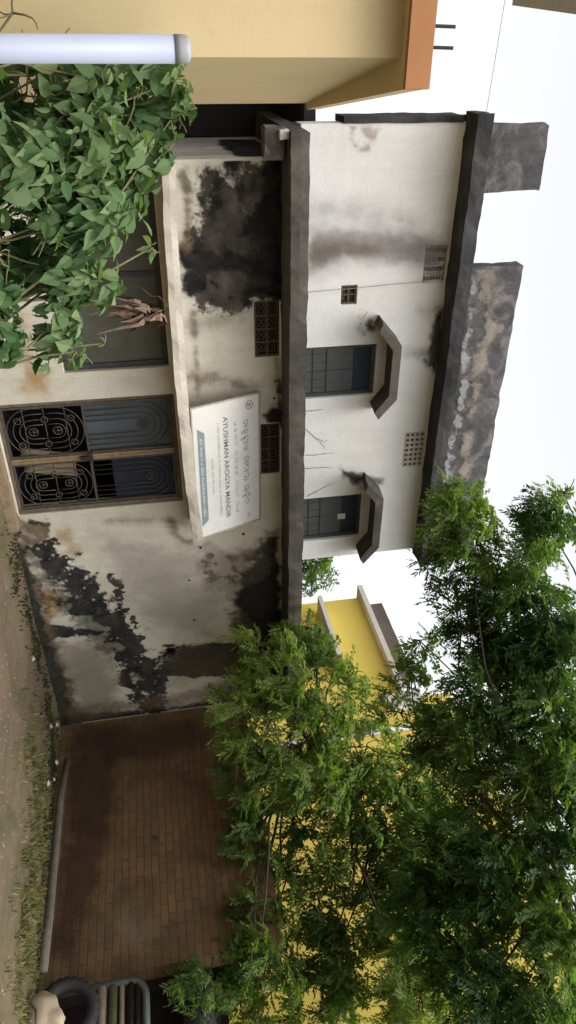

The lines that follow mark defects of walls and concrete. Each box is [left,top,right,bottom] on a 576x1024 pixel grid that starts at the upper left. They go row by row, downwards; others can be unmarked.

water stain [179,139,282,316]
water stain [311,234,424,265]
crack [305,409,333,497]
water stain [204,533,282,691]
water stain [13,532,242,953]